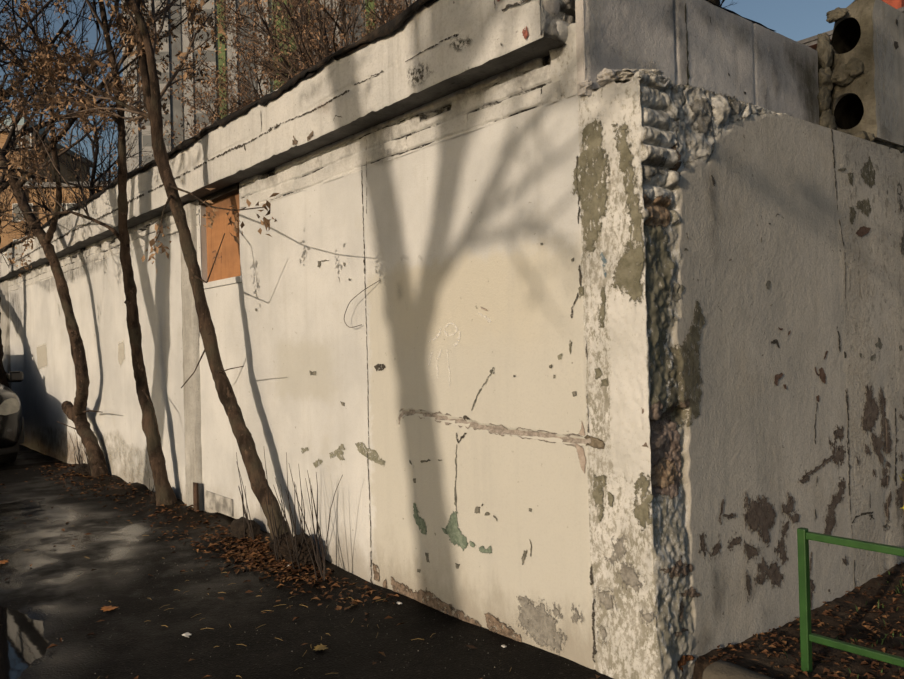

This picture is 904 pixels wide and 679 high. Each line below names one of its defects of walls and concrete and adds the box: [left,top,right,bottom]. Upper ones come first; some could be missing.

peeling [598,287,606,328]
peeling [313,444,345,468]
peeling [355,442,385,465]
peeling [413,503,427,535]
peeling [442,511,492,554]
peeling [372,563,583,653]
peeling [575,421,614,521]
peeling [596,535,645,616]
spalling [633,399,690,531]
peeling [699,492,799,597]
peeling [823,478,846,545]
peeling [798,385,903,489]